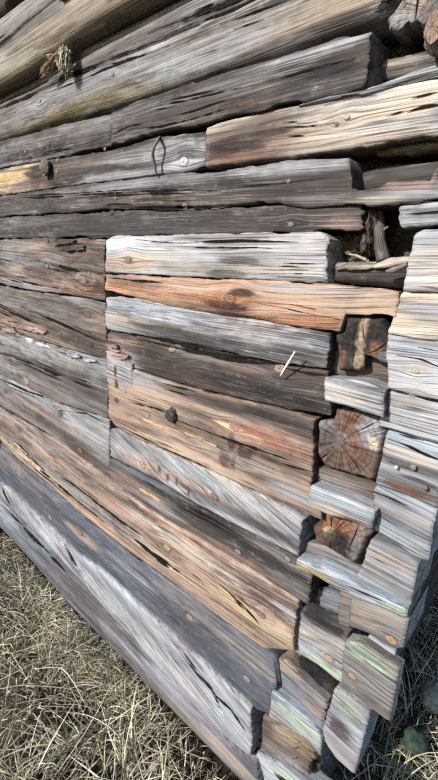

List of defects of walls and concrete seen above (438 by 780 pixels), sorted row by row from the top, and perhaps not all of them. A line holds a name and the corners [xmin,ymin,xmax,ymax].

peeling [0,321,47,334]
crack [26,461,181,574]
crack [224,588,259,624]
crack [181,649,245,731]